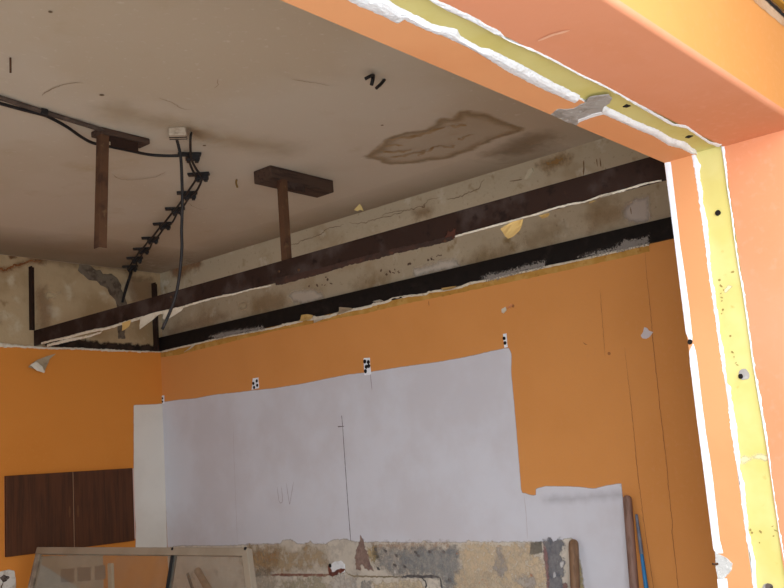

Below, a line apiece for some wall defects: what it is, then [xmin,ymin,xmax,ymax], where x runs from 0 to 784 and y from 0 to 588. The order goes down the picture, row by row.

crack [291,179,485,245]
corrosion [275,228,456,285]
peeling [300,307,352,323]
spalling [348,0,784,588]
flaking render [168,535,584,588]